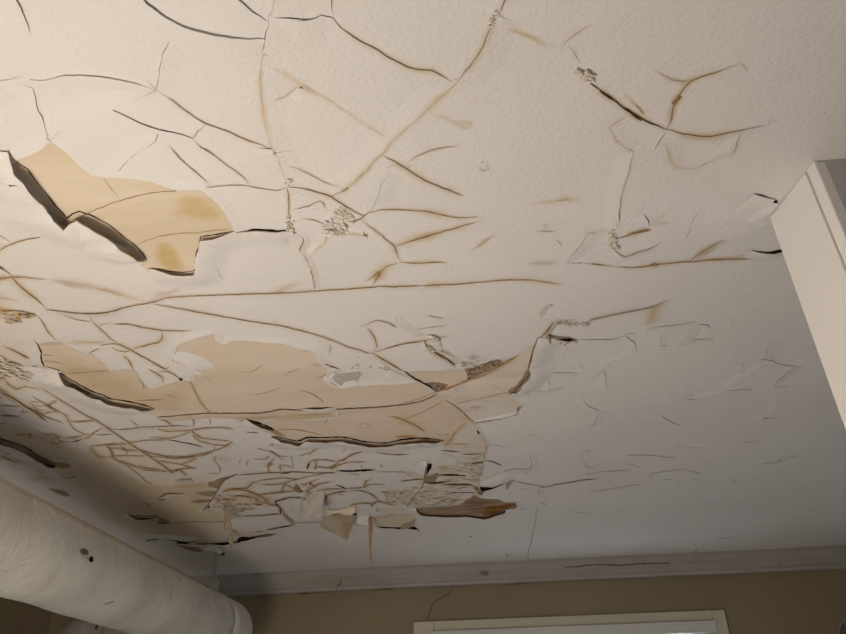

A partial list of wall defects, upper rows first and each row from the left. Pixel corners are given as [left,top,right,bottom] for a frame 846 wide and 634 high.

peeling [0,135,295,289]
crack [0,0,564,390]
crack [615,240,785,268]
peeling [729,193,778,230]
crack [0,378,409,530]
peeling [121,474,295,555]
peeling [0,300,668,532]
crack [485,451,599,561]
crack [565,563,670,578]